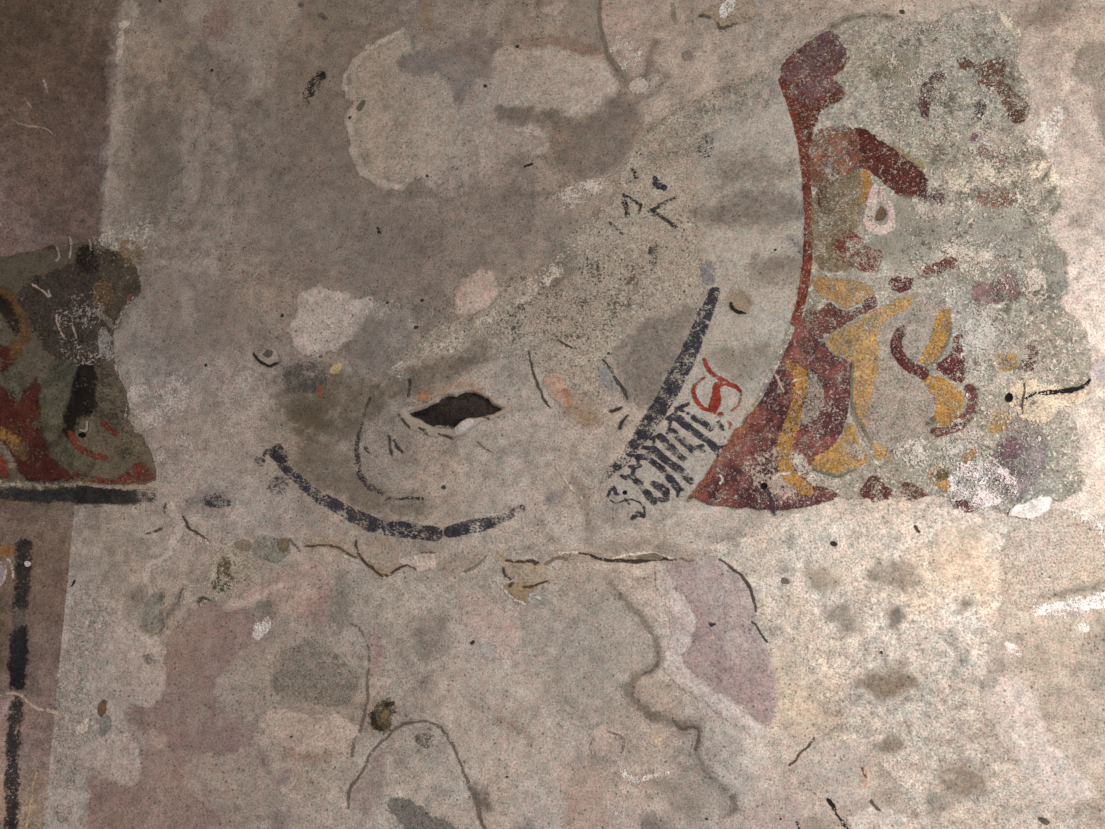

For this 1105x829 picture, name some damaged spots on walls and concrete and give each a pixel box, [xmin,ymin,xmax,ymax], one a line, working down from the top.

leakage [397,0,675,186]
leakage [95,0,539,490]
spalling [281,72,781,439]
spalling [1006,378,1095,427]
crack [346,623,495,829]
crack [789,734,910,829]